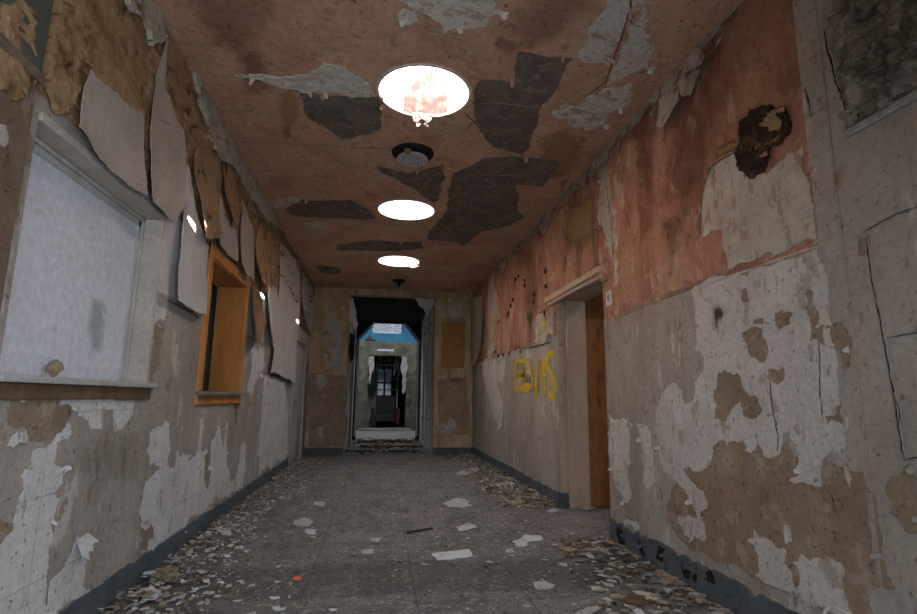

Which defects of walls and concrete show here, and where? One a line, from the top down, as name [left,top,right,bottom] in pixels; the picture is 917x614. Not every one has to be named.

peeling [0,399,135,614]
peeling [137,418,246,556]
spalling [0,0,385,476]
spalling [337,0,744,430]
peeling [608,146,895,614]
spalling [749,106,785,157]
crack [862,207,917,461]
spalling [885,465,917,534]